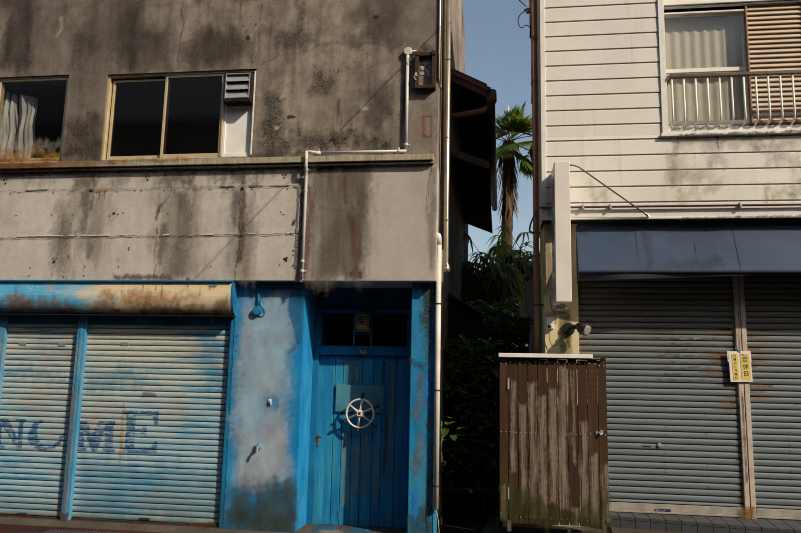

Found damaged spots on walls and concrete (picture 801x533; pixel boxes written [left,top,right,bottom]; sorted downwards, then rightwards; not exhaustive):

water stain [254,79,392,157]
water stain [311,166,368,280]
rust [0,292,77,314]
water stain [223,480,297,533]